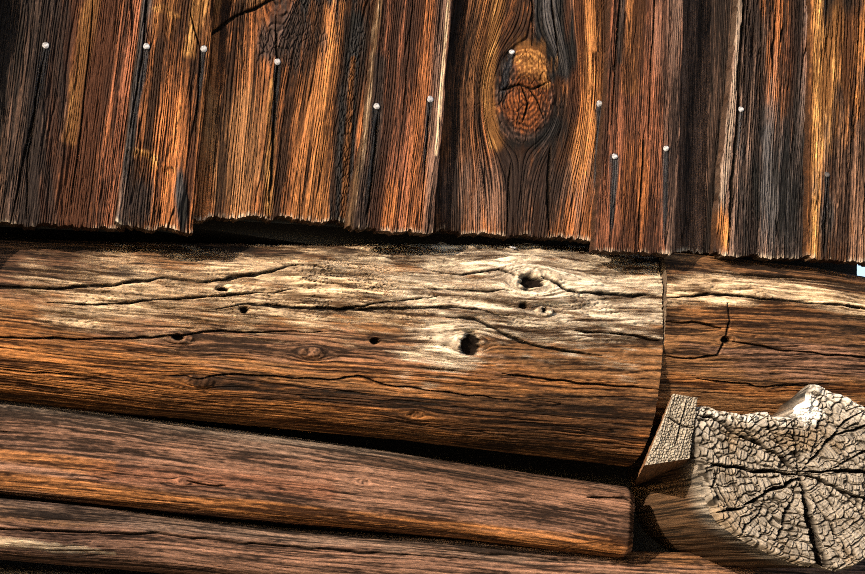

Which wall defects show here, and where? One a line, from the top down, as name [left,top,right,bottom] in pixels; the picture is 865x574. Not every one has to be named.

crack [190,0,273,121]
crack [268,23,278,219]